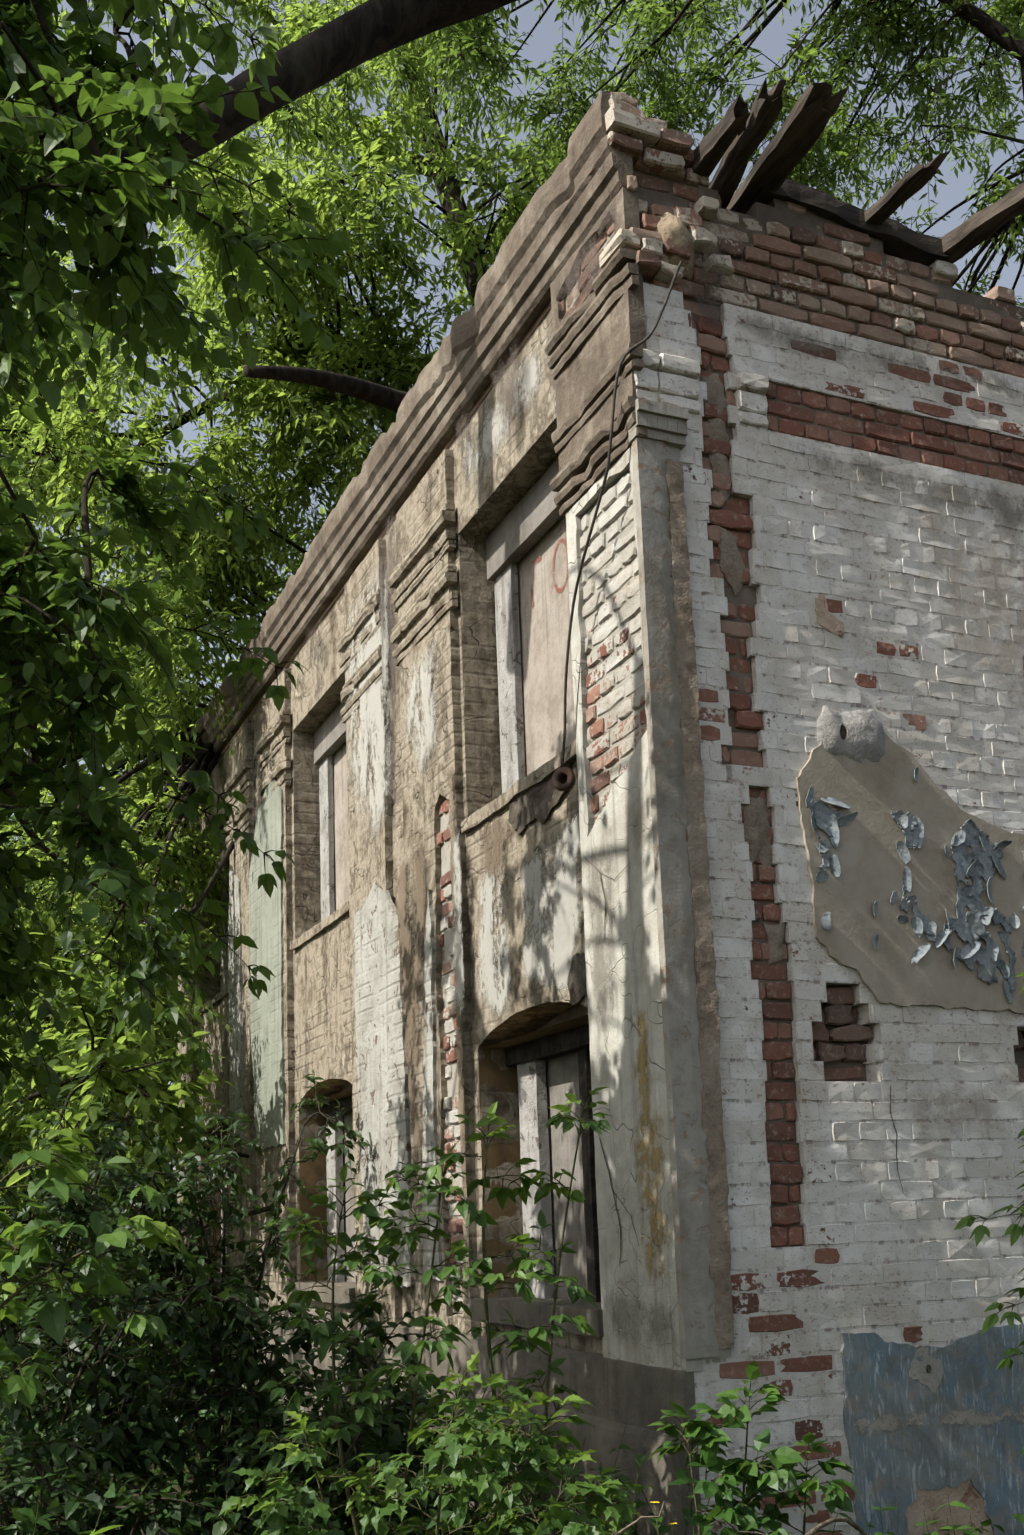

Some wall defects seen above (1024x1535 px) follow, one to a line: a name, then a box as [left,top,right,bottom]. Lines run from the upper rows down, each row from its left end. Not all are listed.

flaking render [765,360,1024,485]
flaking render [508,471,647,835]
peeling [805,787,858,883]
flaking render [666,458,844,1396]
peeling [873,810,1024,1003]
spalling [812,986,873,1081]
spalling [1013,1030,1024,1082]
leakage [635,1014,669,1277]
flaking render [903,1326,923,1343]
flaking render [790,1441,841,1460]
flaking render [905,1480,994,1535]